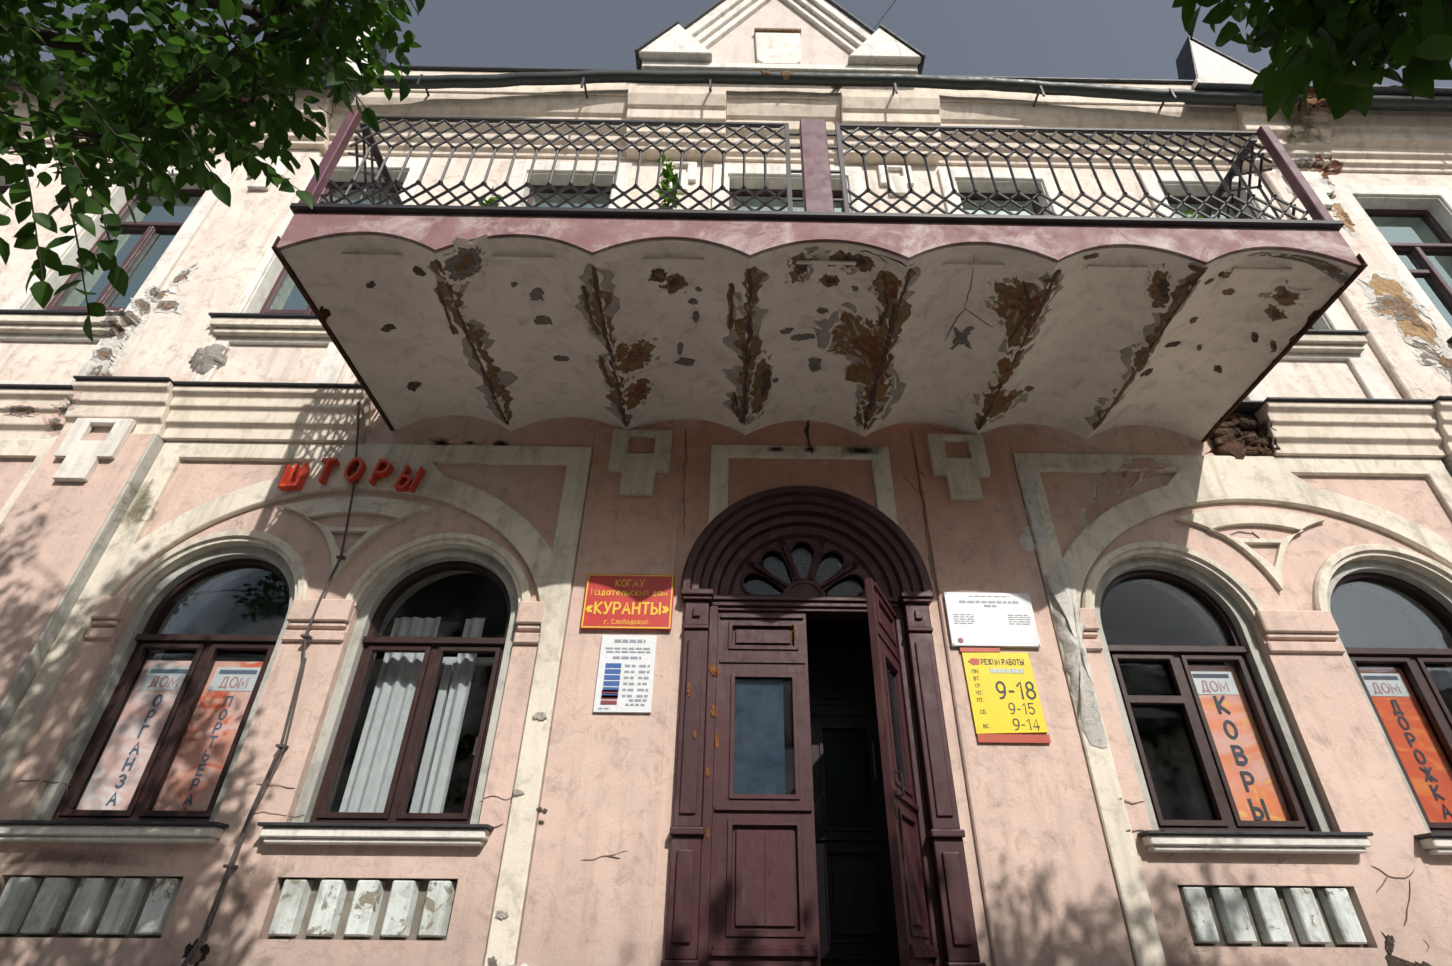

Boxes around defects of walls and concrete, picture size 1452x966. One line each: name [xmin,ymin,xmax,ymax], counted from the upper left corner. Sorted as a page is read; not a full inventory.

peeling [406,381,422,392]
peeling [412,234,518,425]
peeling [575,262,702,427]
spalling [722,244,921,431]
peeling [950,326,974,350]
crack [945,257,992,340]
spalling [973,269,1064,430]
spalling [1247,252,1452,382]
spalling [1205,412,1281,460]
spalling [488,956,536,966]
crack [1371,865,1430,951]
spalling [1385,935,1432,966]